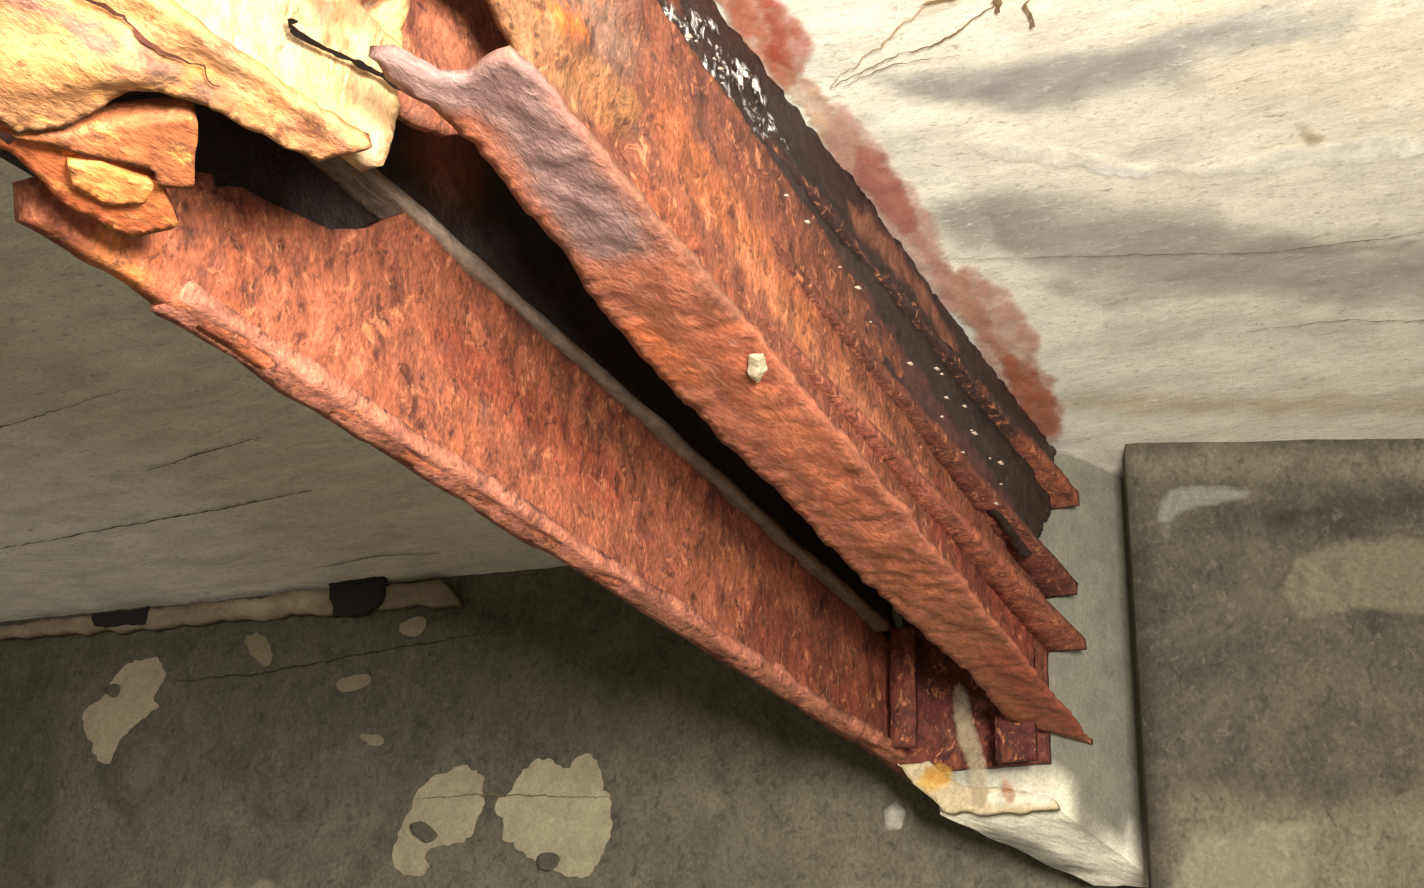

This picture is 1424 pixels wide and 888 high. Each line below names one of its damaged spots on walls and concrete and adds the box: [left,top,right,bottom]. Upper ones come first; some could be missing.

crack [85,0,221,87]
crack [831,0,1035,88]
corrosion [721,0,1061,441]
peeling [82,657,166,764]
peeling [392,753,613,878]